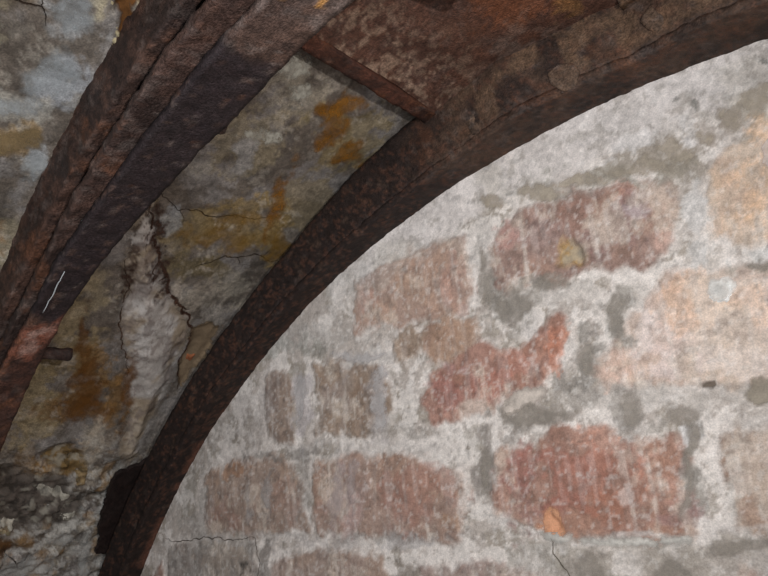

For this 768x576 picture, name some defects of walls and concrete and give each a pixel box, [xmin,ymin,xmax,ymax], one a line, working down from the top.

crack [16,0,47,24]
corrosion [315,92,364,167]
crack [118,260,132,383]
crack [146,194,277,389]